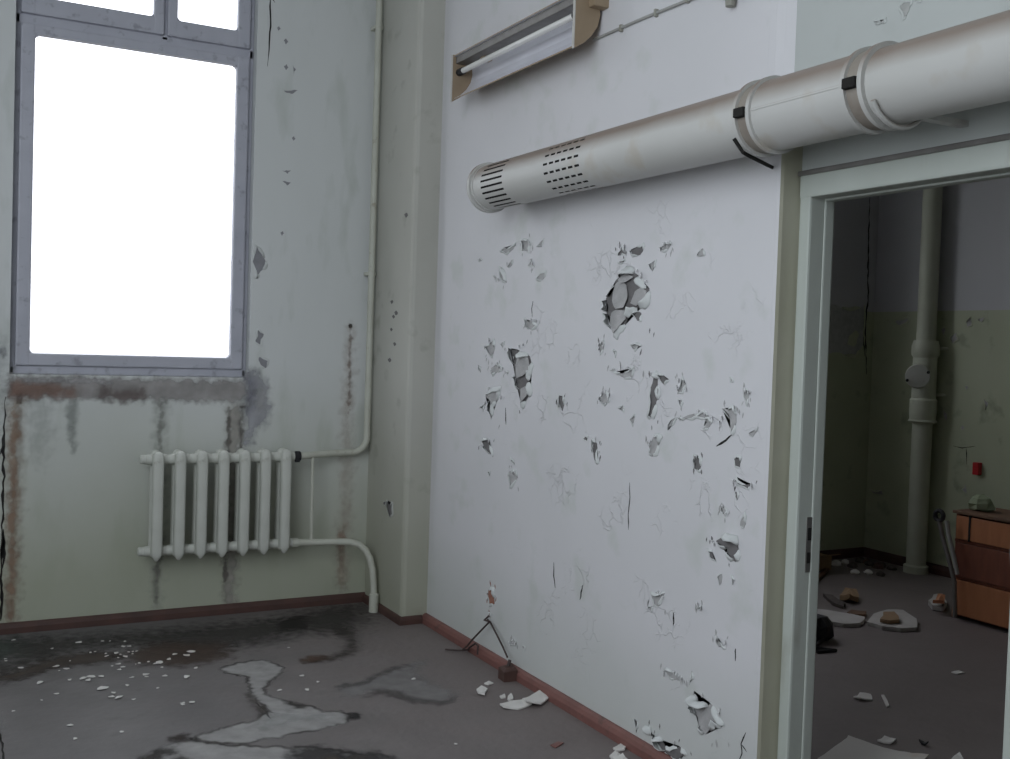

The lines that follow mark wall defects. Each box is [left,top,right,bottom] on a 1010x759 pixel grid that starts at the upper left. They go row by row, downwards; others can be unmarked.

peeling [597,241,751,457]
rust [6,400,21,623]
crack [0,733,8,759]
damp [0,605,389,759]
damp [341,662,451,702]